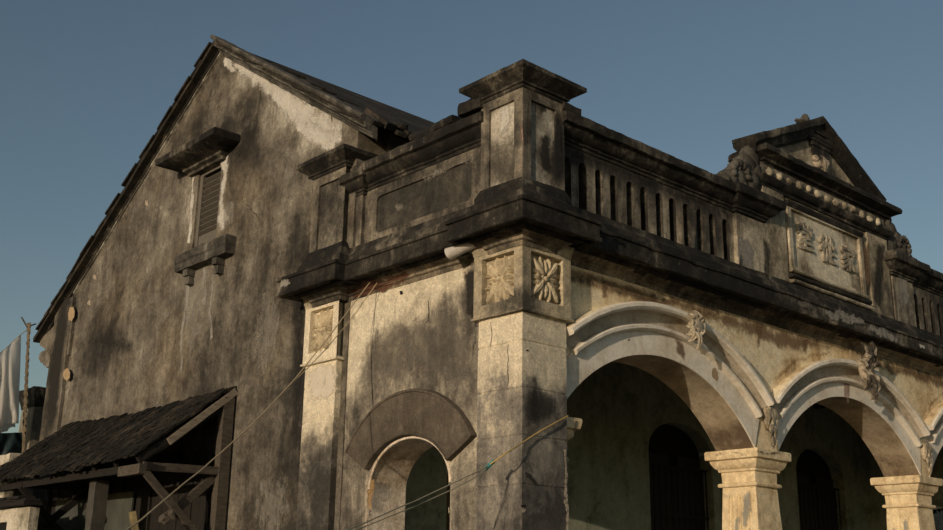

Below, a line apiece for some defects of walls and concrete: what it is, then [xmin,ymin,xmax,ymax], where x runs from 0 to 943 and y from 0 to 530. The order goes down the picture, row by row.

peeling [223,57,342,150]
water stain [217,156,229,229]
water stain [464,271,474,318]
water stain [601,277,829,375]
water stain [737,238,770,274]
water stain [862,245,885,307]
water stain [293,302,303,445]